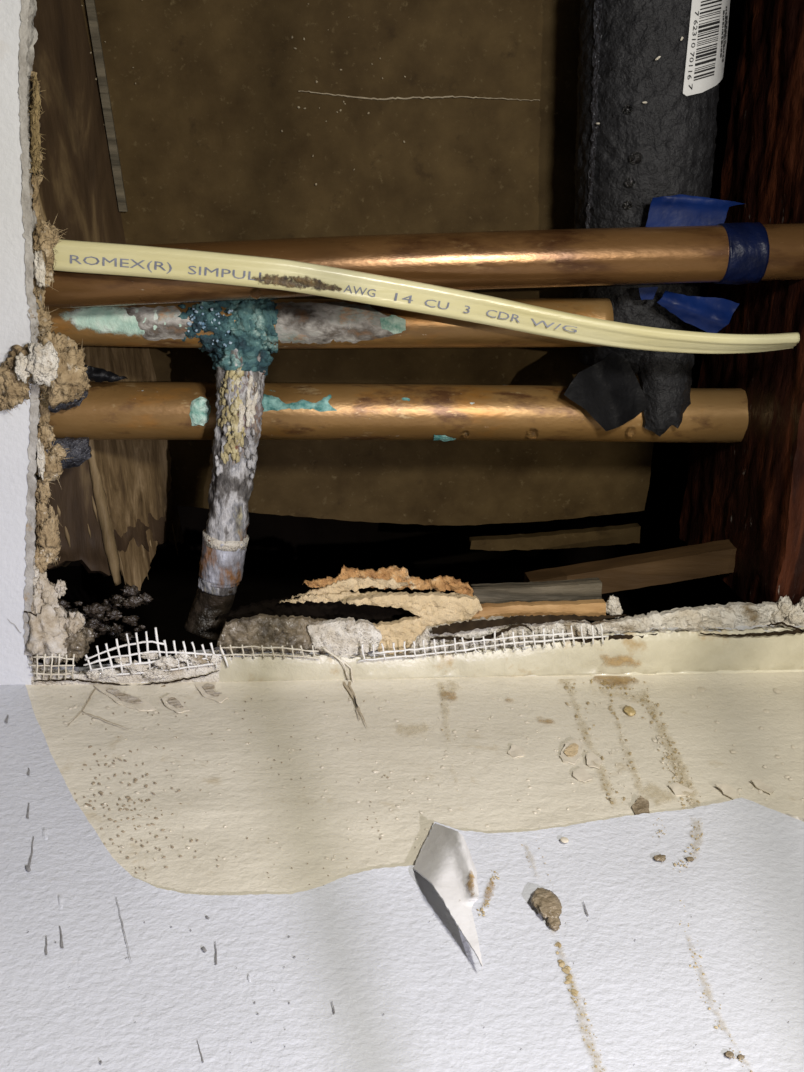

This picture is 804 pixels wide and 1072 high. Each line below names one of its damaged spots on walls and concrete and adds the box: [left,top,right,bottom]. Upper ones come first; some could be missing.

spalling [18,0,51,344]
peeling [23,377,804,896]
leakage [558,682,640,804]
leakage [633,688,701,809]
leakage [554,942,605,1072]
leakage [679,921,753,1072]